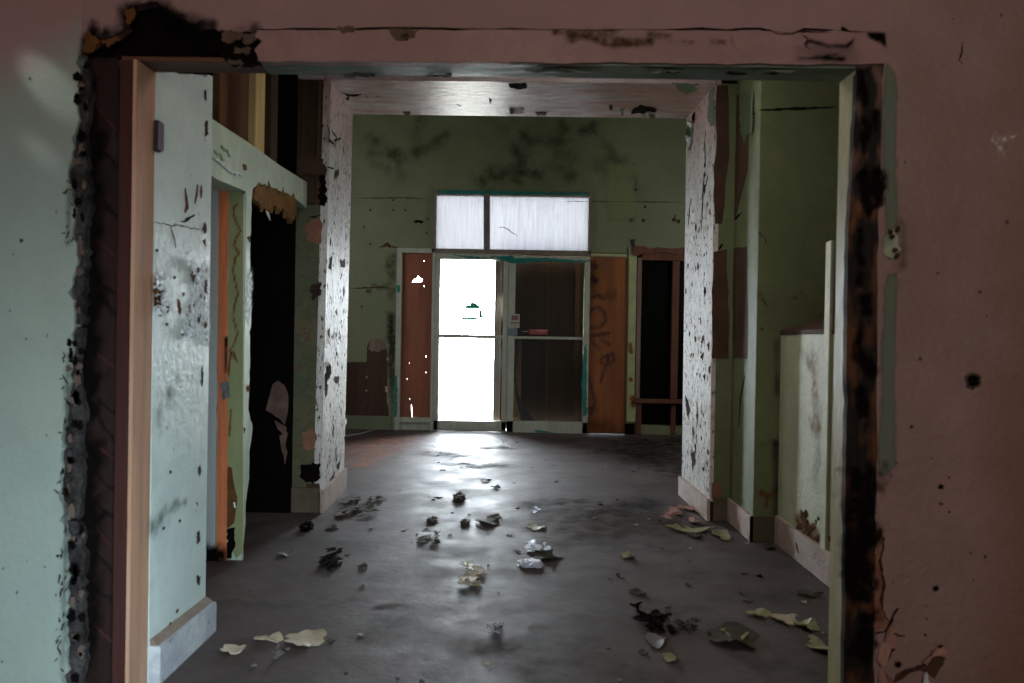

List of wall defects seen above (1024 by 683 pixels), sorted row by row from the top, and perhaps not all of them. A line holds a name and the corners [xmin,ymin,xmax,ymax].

spalling [83,7,136,55]
spalling [199,30,263,68]
spalling [46,68,115,683]
crack [153,222,201,248]
flaking render [300,219,389,491]
peeling [682,69,796,499]
peeling [796,509,831,543]
peeling [874,528,950,683]